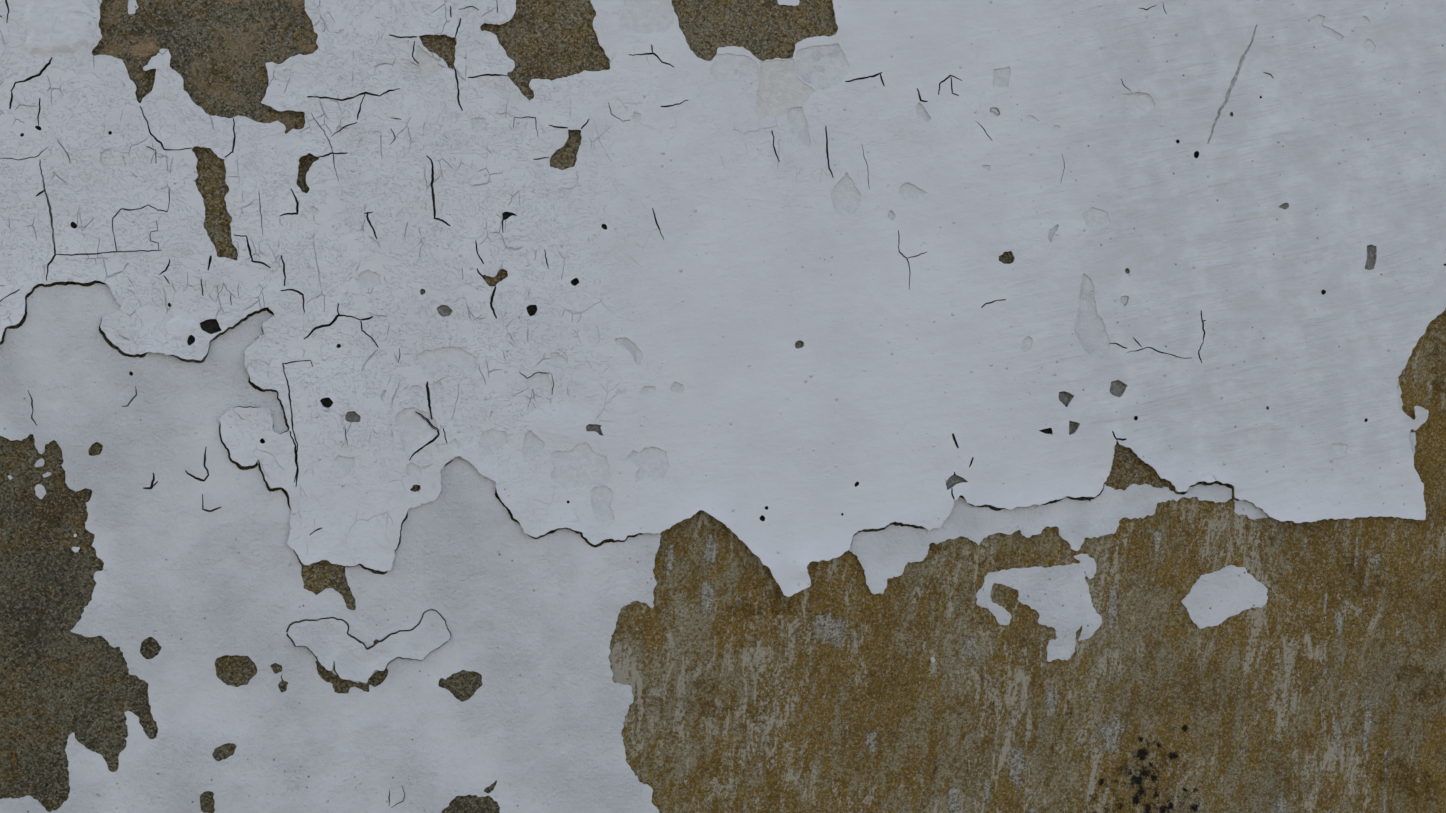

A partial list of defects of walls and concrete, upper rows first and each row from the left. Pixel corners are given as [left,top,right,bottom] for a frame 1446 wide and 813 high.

peeling [92,0,318,134]
crack [307,34,419,181]
peeling [480,0,610,100]
peeling [671,0,838,61]
crack [0,57,400,486]
crack [426,155,504,319]
crack [409,382,447,460]
peeling [0,434,158,812]
peeling [495,308,1446,813]
water stain [1108,585,1119,631]
water stain [1323,592,1344,634]
water stain [1079,718,1203,813]